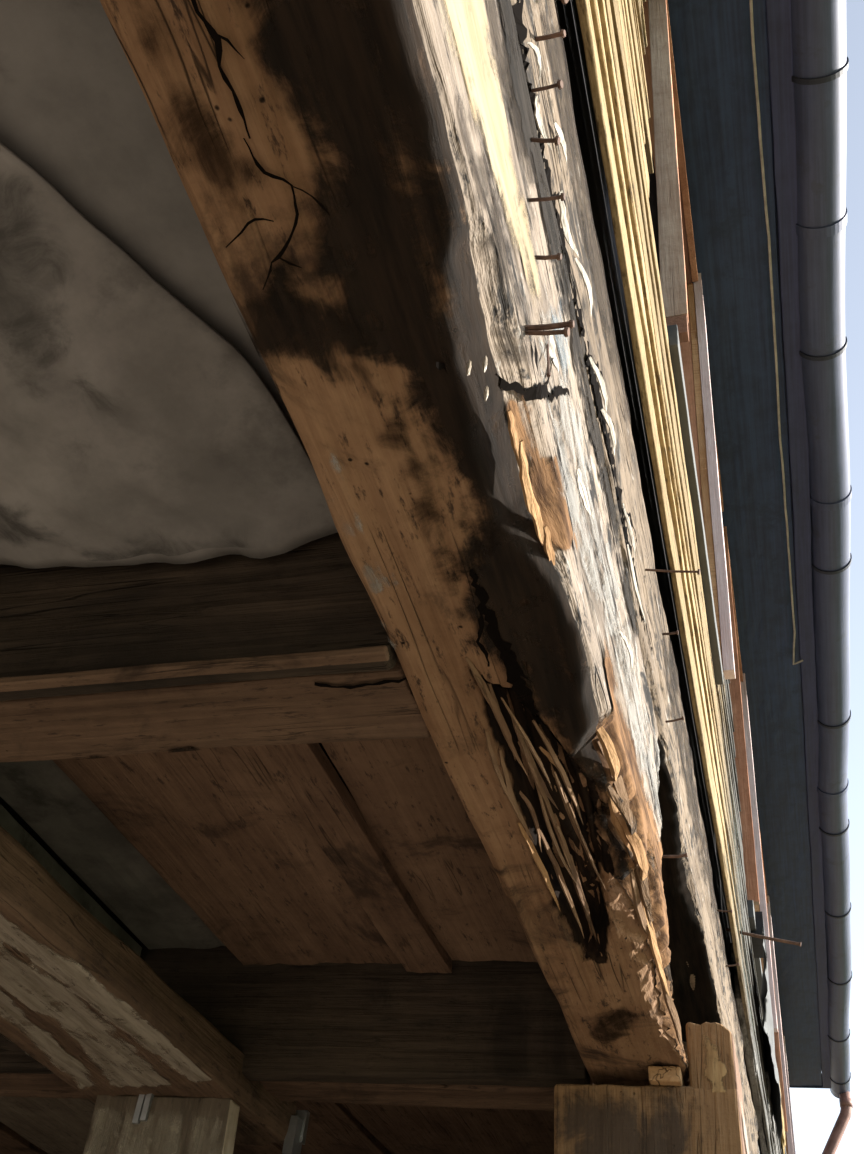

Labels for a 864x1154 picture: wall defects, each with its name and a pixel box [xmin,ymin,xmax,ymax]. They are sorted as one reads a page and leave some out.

crack [191,0,330,290]
peeling [534,95,567,165]
peeling [558,190,593,315]
peeling [549,313,568,373]
crack [496,0,652,651]
peeling [589,356,616,456]
peeling [576,468,594,520]
peeling [622,503,646,623]
spalling [465,657,684,1050]